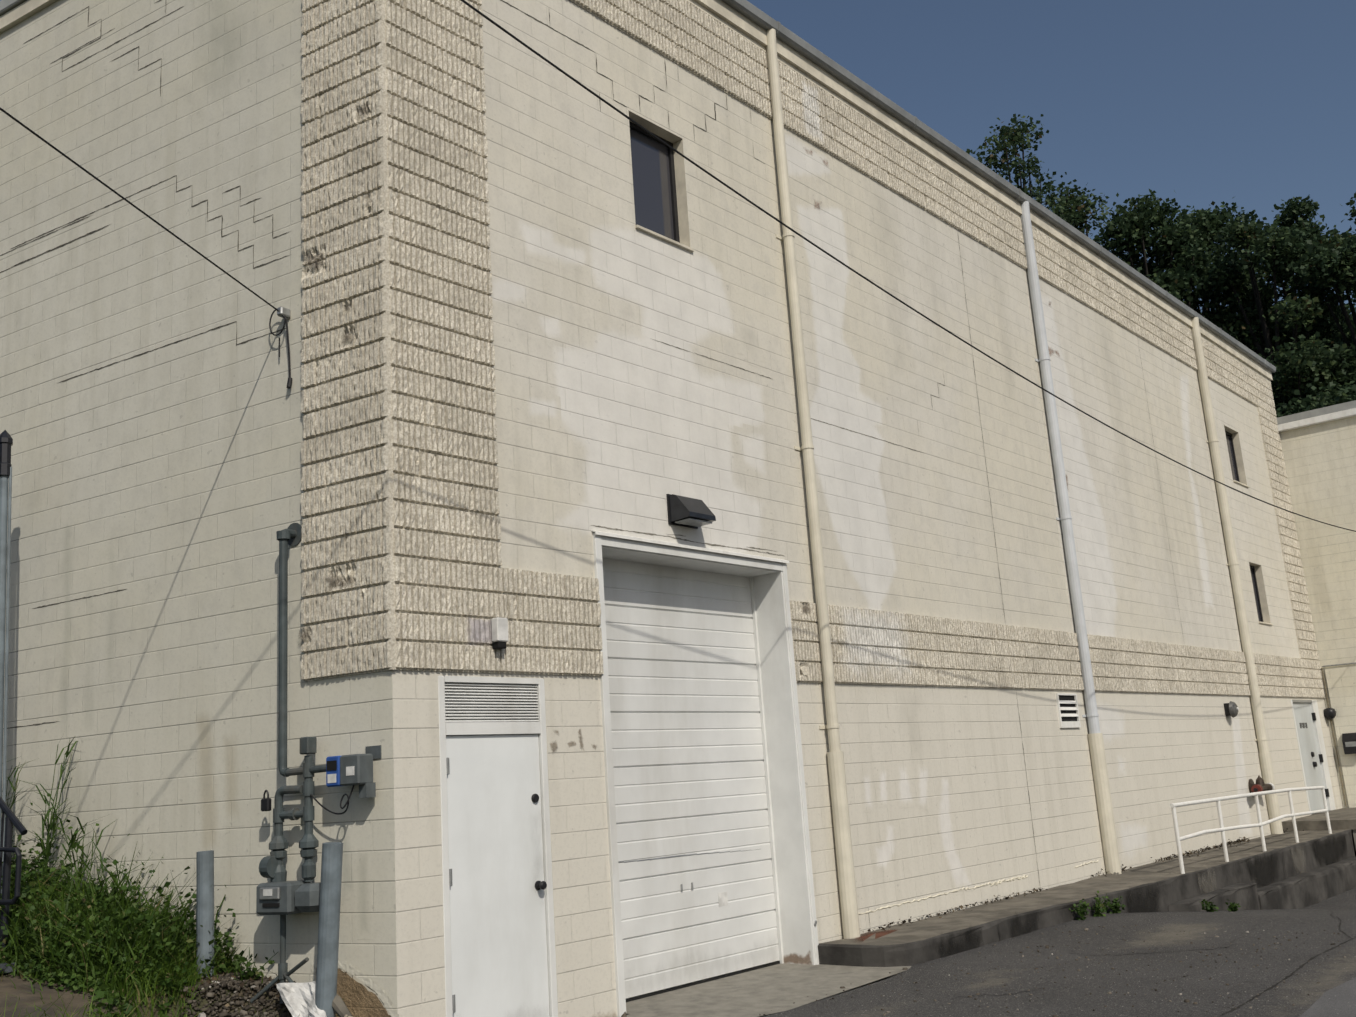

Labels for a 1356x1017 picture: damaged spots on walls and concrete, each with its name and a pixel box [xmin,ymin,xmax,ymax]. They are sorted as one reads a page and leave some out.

crack [25,0,182,97]
crack [501,0,751,140]
crack [0,175,291,273]
crack [59,321,286,383]
leakage [828,605,975,892]